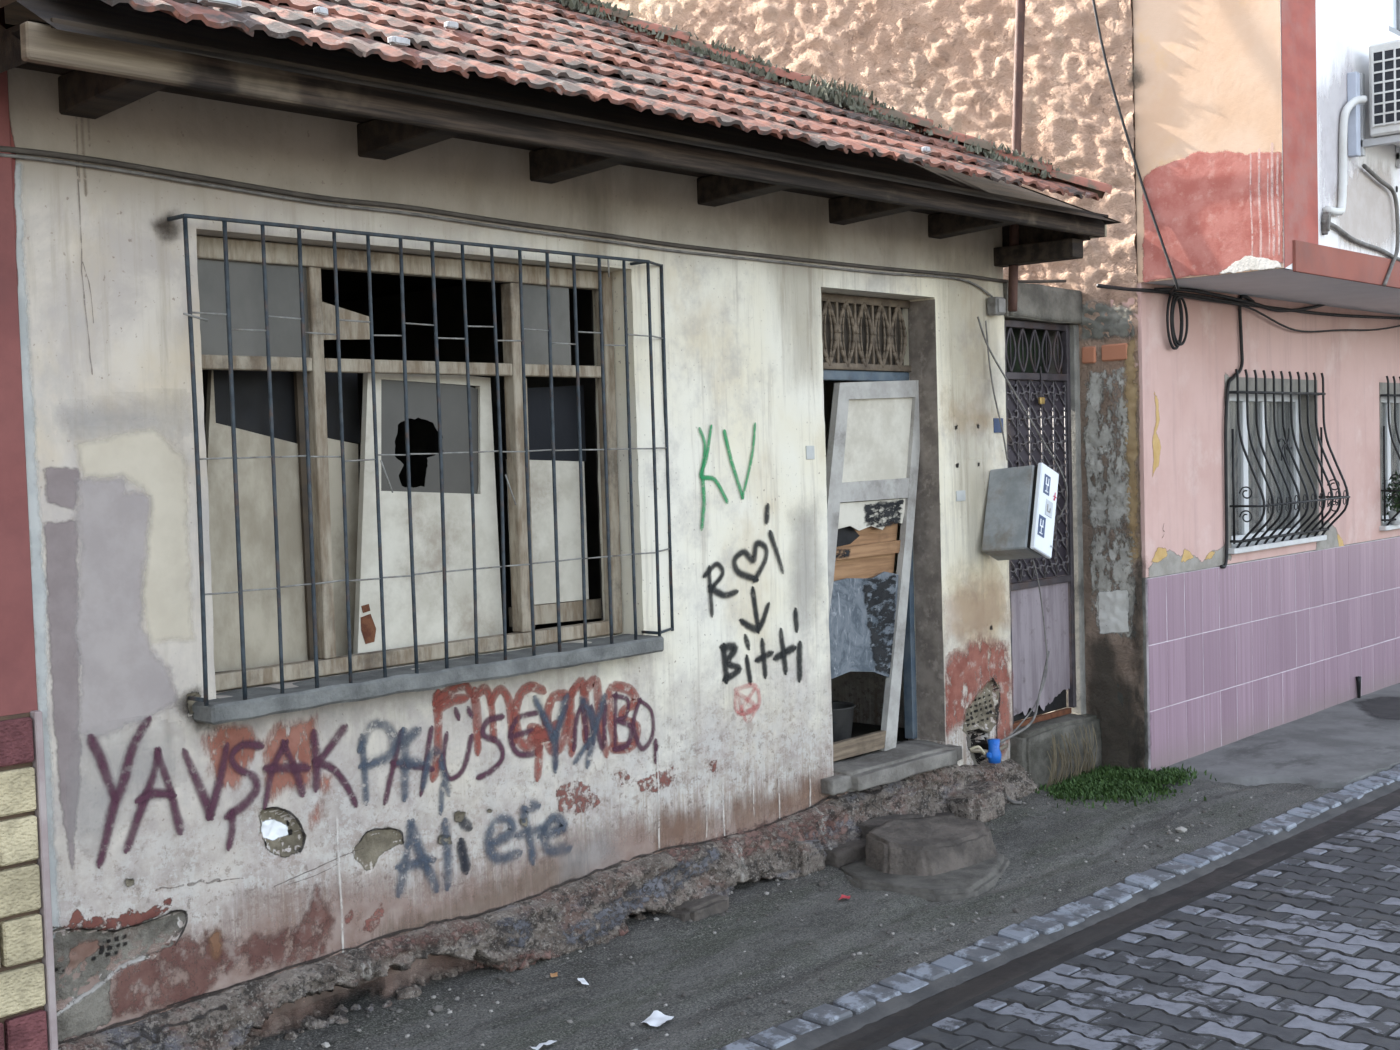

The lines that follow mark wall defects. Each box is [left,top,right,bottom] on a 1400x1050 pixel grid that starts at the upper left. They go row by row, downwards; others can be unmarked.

flaking render [1221,256,1281,274]
peeling [1082,343,1232,637]
peeling [1316,522,1344,550]
peeling [945,638,1013,765]
peeling [207,718,330,858]
flaking render [53,810,849,1041]